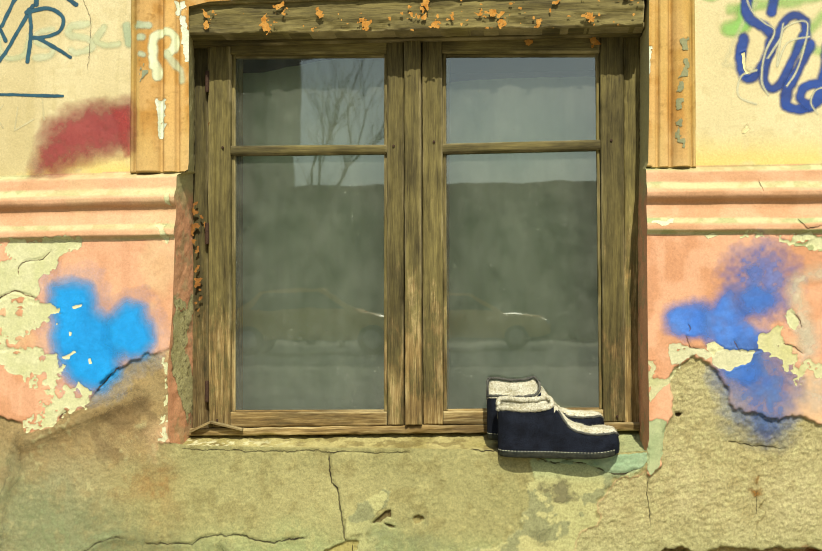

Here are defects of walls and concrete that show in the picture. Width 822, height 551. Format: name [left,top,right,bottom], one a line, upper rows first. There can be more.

peeling [174,1,189,62]
peeling [259,1,288,35]
peeling [400,0,542,29]
peeling [675,37,690,148]
peeling [155,98,167,139]
peeling [779,231,822,251]
crack [0,252,50,298]
spalling [0,235,203,551]
spalling [545,308,822,551]
crack [146,534,303,545]
crack [182,448,407,551]
spalling [373,510,394,528]